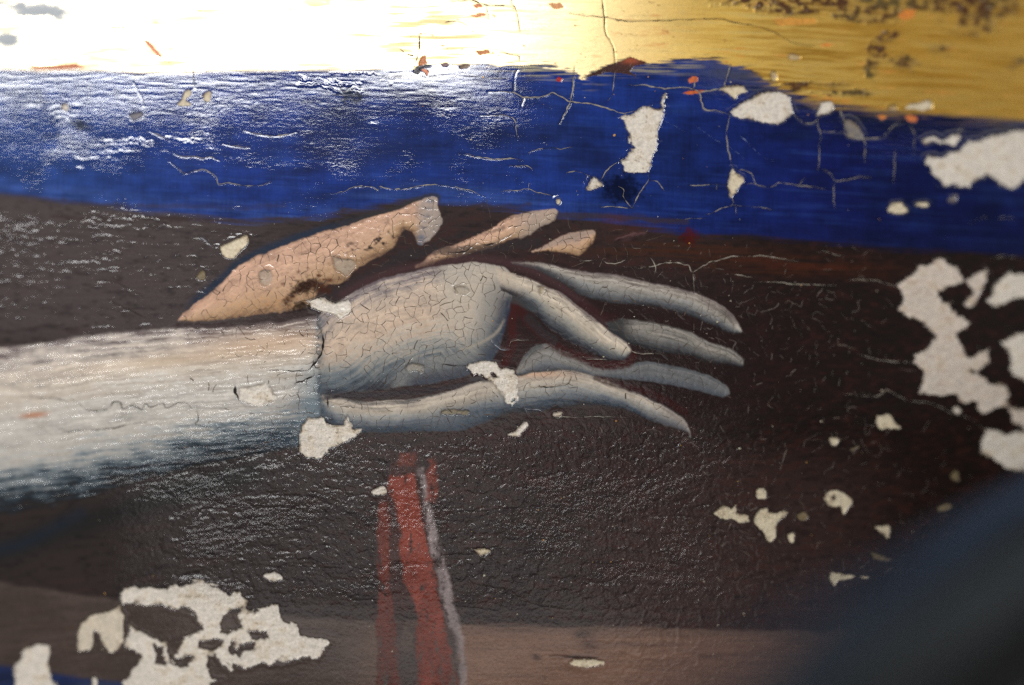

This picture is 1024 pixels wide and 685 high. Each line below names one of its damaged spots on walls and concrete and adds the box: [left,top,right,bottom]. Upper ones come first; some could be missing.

peeling [621,93,667,174]
crack [470,4,915,220]
peeling [720,72,793,125]
peeling [922,131,1024,203]
crack [587,254,893,286]
peeling [467,361,519,405]
crack [514,379,626,418]
peeling [898,259,1024,473]
peeling [300,417,362,459]
peeling [714,489,809,543]
peeling [78,580,330,685]
peeling [14,644,55,685]